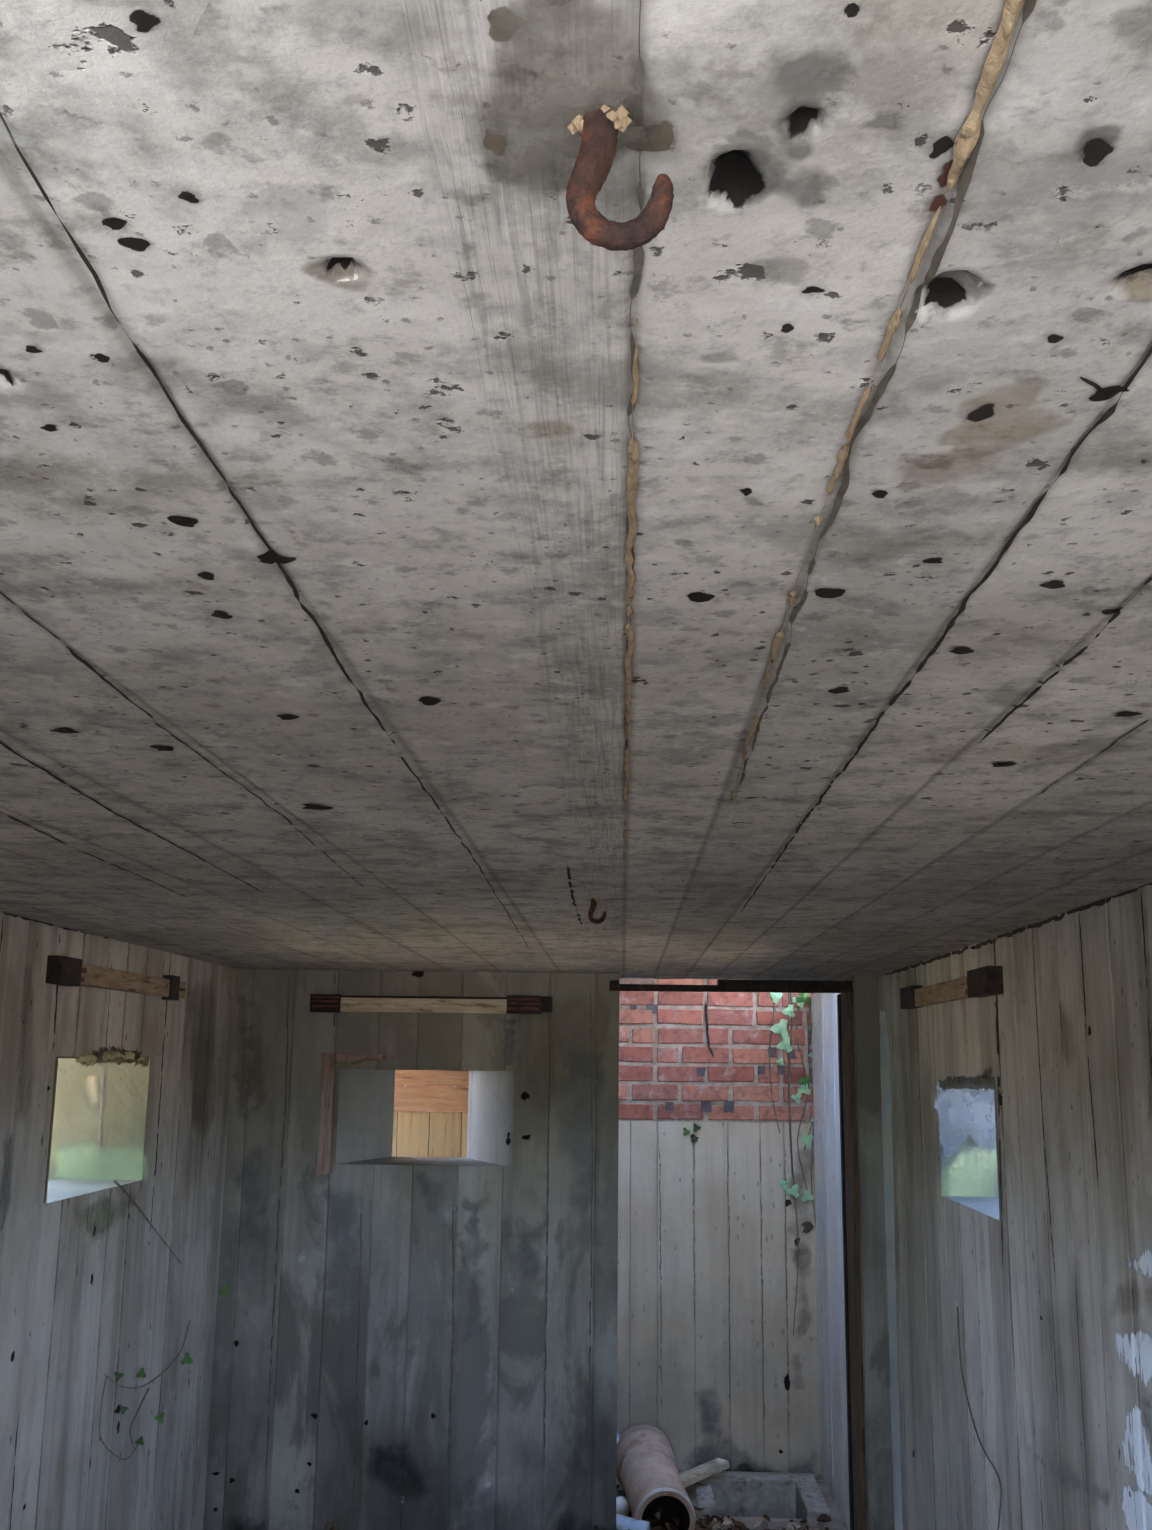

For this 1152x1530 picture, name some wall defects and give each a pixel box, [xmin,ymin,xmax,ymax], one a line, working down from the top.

crack [739,346,1152,914]
crack [567,863,620,925]
peeling [1129,1248,1152,1279]
peeling [1115,1330,1152,1387]
leakage [371,1447,425,1498]
peeling [1121,1404,1152,1530]